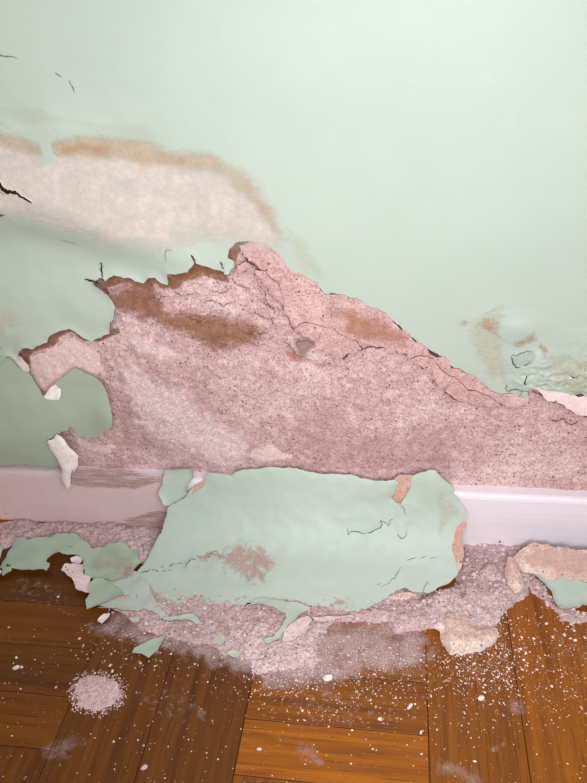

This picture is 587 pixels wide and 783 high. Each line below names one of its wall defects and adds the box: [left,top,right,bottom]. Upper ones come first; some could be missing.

crack [0,181,33,203]
leakage [0,137,278,261]
leakage [102,264,258,351]
spalling [0,241,587,491]
crack [505,351,530,396]
crack [347,506,407,539]
peeling [85,578,124,609]